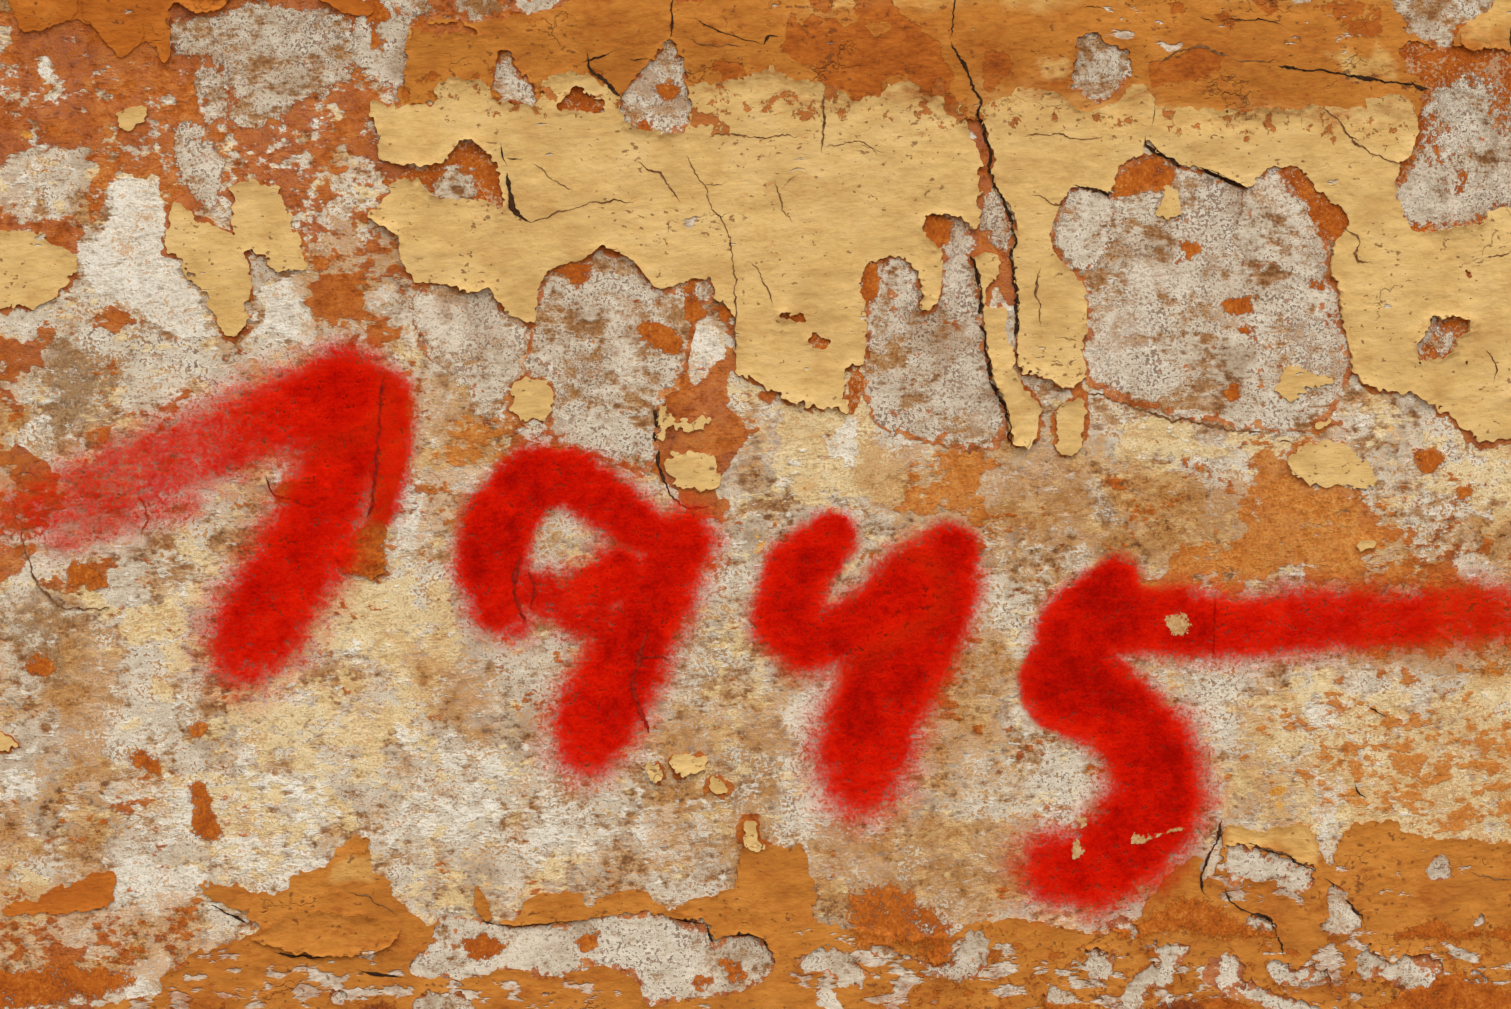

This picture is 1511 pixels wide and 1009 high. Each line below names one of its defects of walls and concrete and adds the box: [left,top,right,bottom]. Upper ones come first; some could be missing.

crack [1145,107,1248,189]
peeling [0,0,1511,492]
crack [949,0,1110,445]
peeling [340,463,404,581]
peeling [1452,483,1477,501]
peeling [0,732,18,752]
peeling [184,780,228,843]
peeling [0,816,1511,1009]